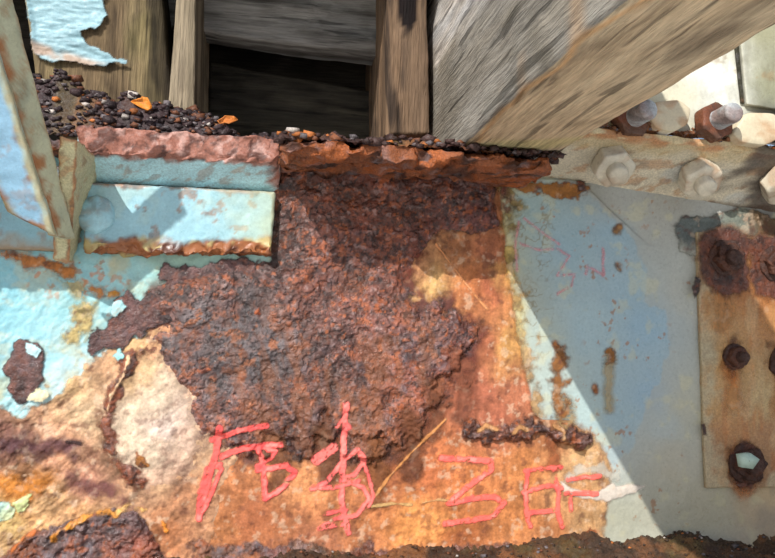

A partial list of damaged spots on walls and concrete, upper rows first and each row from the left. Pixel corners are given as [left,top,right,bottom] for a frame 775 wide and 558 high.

peeling [26,0,127,66]
peeling [157,256,256,286]
rust [696,224,775,332]
peeling [87,290,173,360]
peeling [2,338,49,404]
rust [0,172,612,558]
rust [727,440,758,496]
peeling [12,494,32,513]